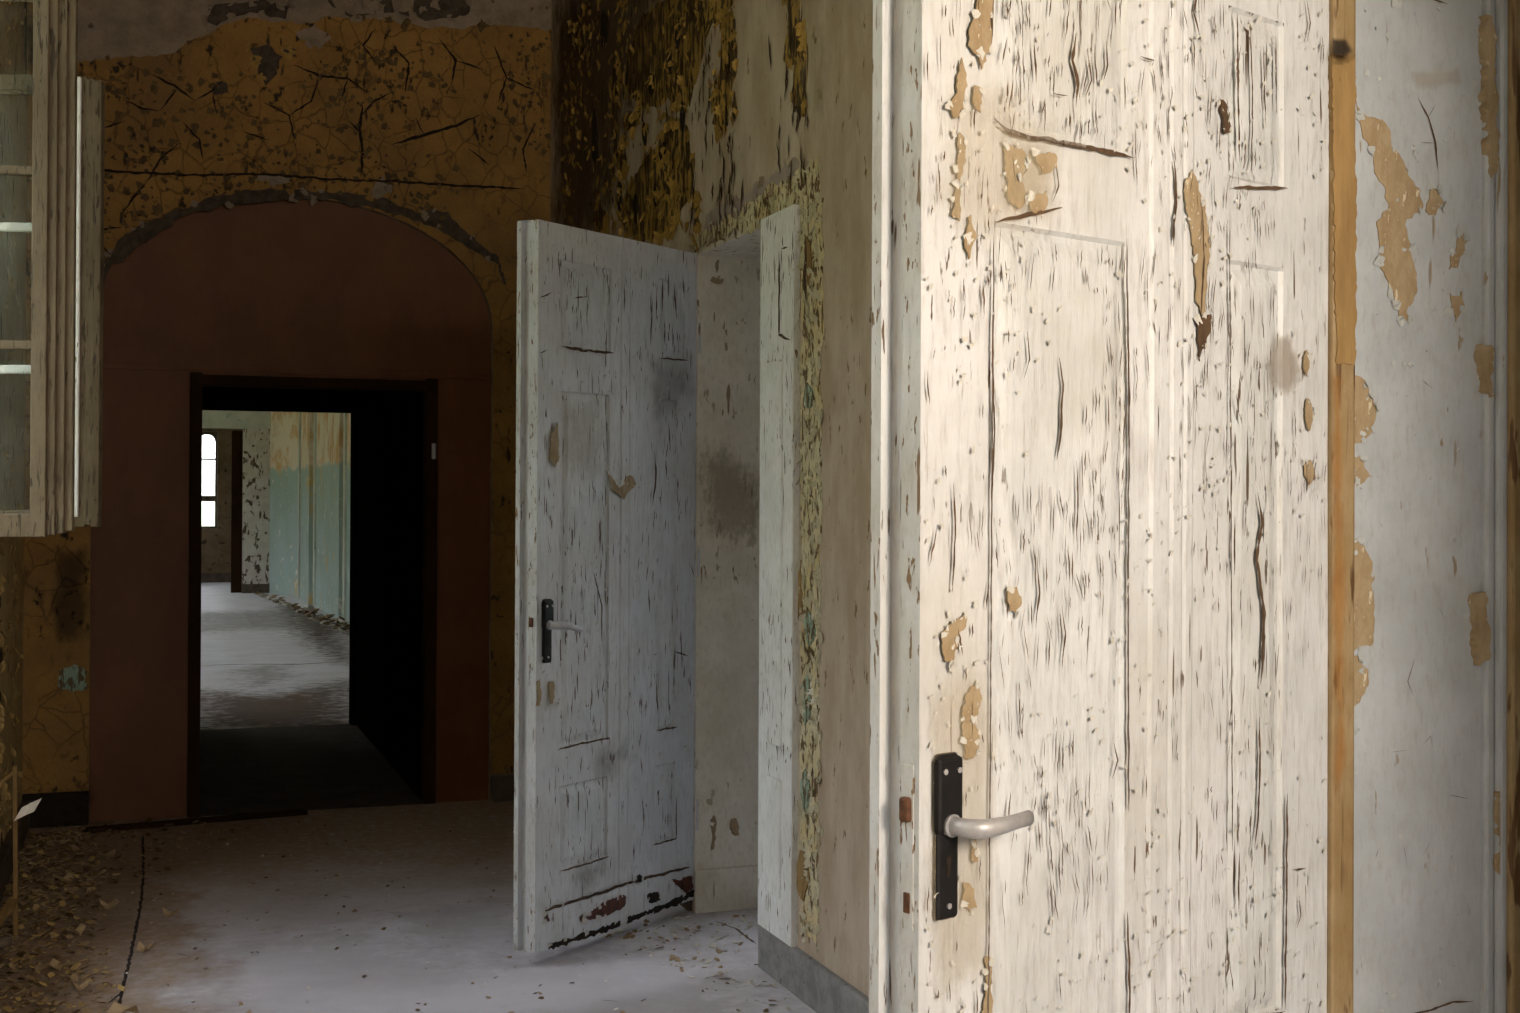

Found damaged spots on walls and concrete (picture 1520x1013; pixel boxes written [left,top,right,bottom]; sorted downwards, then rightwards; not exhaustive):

peeling [1475,14,1500,180]
peeling [945,0,1063,363]
peeling [1099,0,1327,503]
peeling [1355,101,1471,327]
peeling [1473,344,1496,397]
flaking render [77,0,824,954]
crack [104,0,810,944]
peeling [1467,588,1491,666]
crack [108,836,145,1004]
peeling [1493,791,1507,902]
crack [1416,1001,1473,1013]